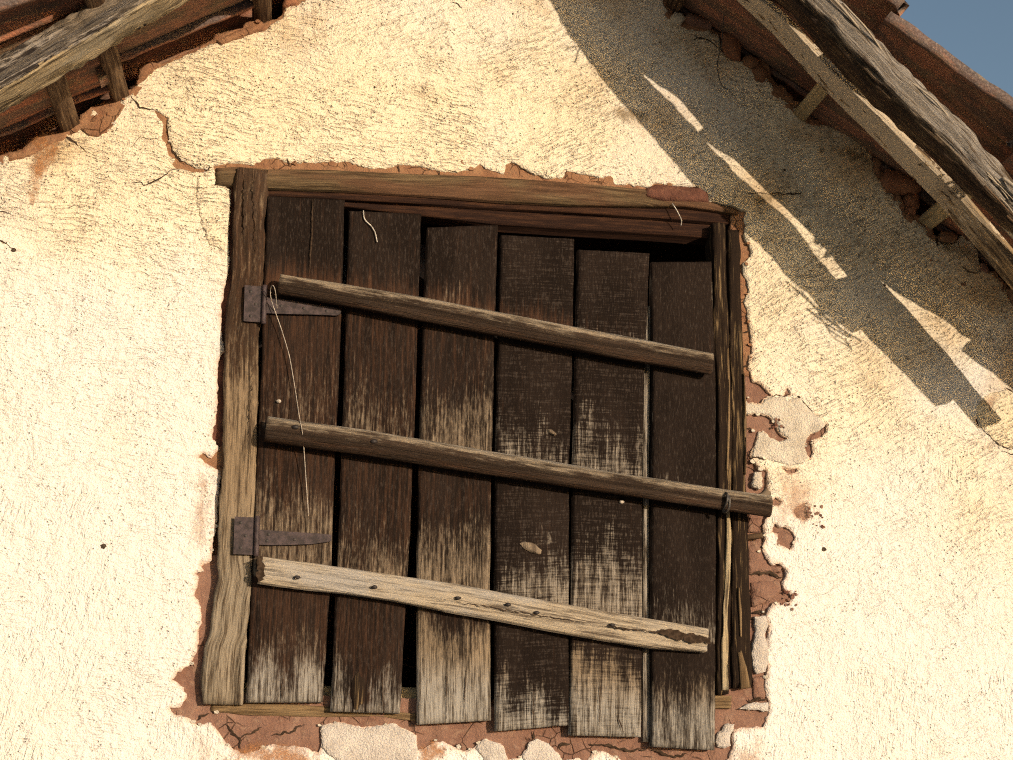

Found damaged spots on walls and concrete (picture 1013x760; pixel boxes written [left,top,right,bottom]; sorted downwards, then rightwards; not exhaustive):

flaking render [0,8,286,164]
crack [131,96,212,186]
flaking render [213,156,672,189]
flaking render [804,426,825,458]
flaking render [793,501,825,529]
flaking render [747,514,798,646]
flaking render [170,517,770,760]